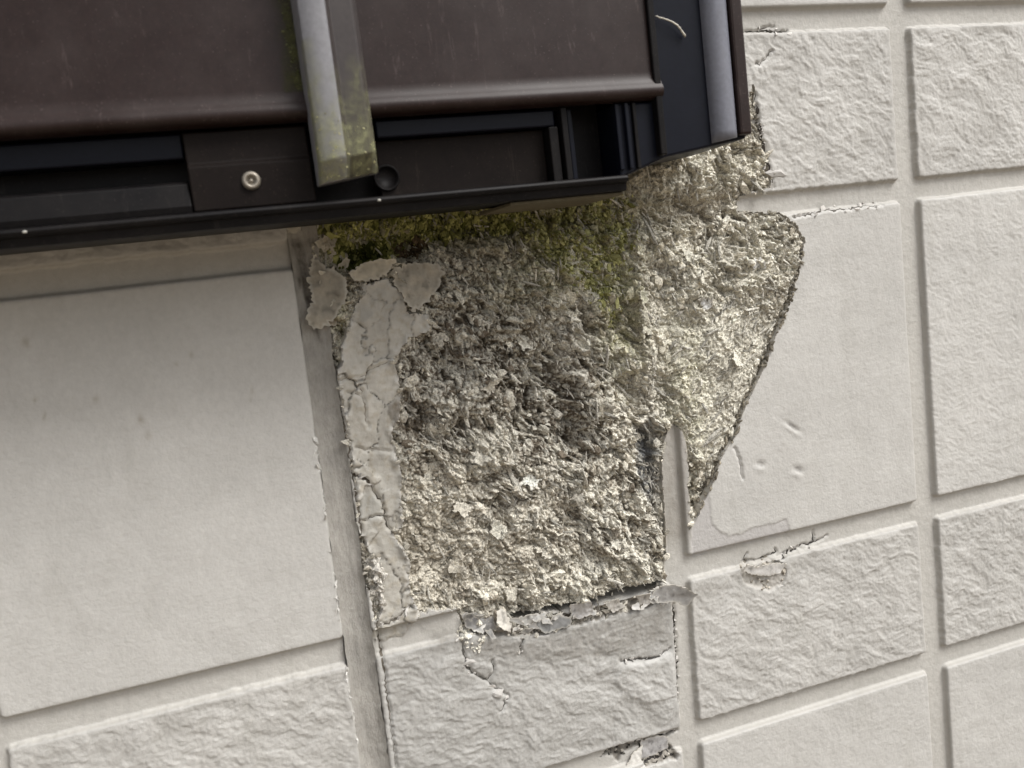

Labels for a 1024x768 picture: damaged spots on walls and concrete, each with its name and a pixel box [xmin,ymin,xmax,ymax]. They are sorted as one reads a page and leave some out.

crack [340,362,411,764]
spalling [306,89,806,653]
peeling [605,729,676,766]
crack [795,202,879,218]